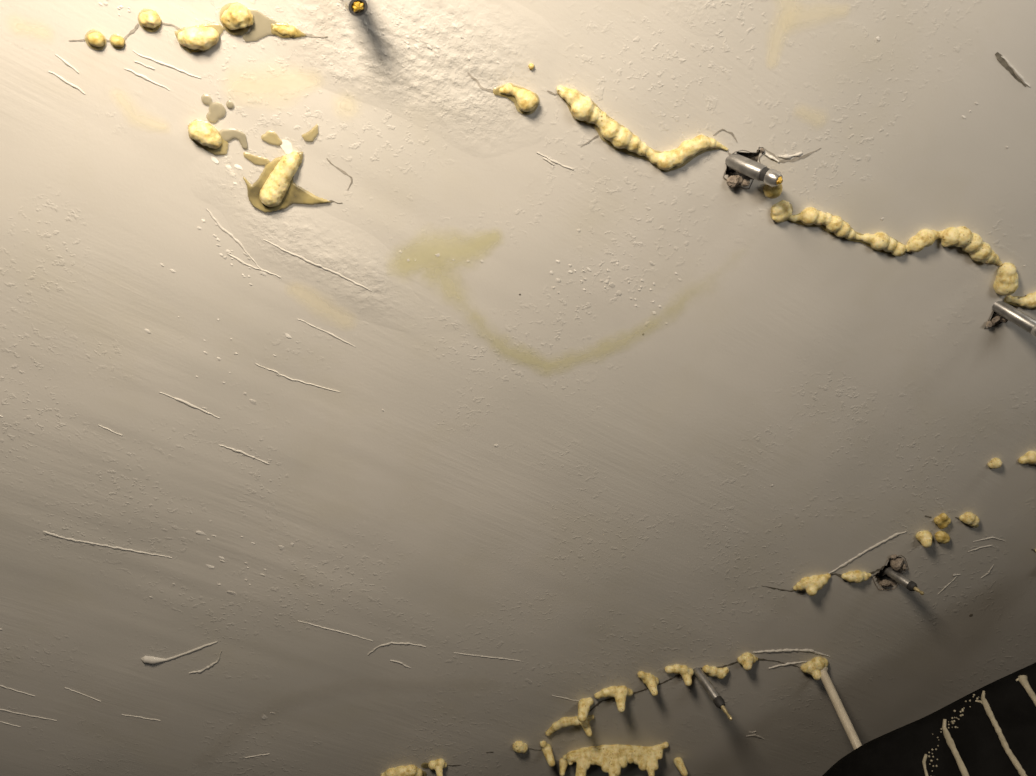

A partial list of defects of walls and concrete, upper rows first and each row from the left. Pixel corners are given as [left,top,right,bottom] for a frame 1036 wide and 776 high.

crack [69,22,180,42]
crack [467,72,493,92]
crack [713,129,738,155]
crack [764,148,821,163]
crack [320,158,353,204]
crack [588,658,800,714]